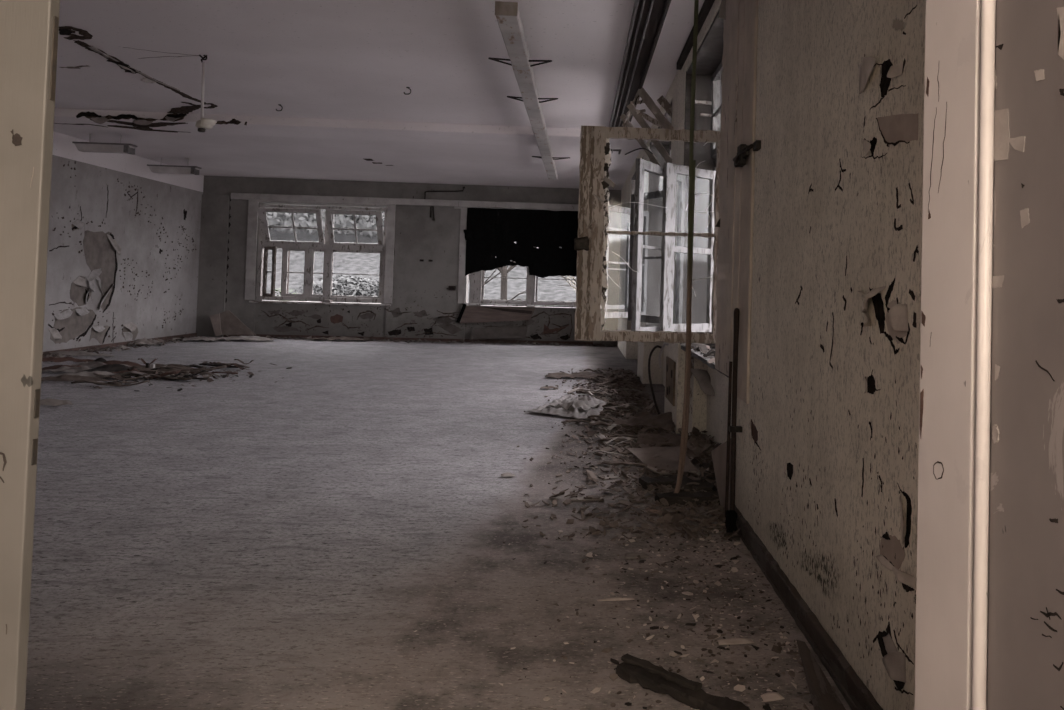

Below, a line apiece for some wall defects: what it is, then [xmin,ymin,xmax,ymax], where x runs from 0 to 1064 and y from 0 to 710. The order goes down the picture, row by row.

peeling [1056,7,1064,60]
peeling [76,102,218,133]
peeling [859,55,918,159]
crack [808,159,846,194]
peeling [48,179,196,344]
peeling [257,290,575,340]
peeling [857,278,926,355]
peeling [864,370,881,394]
peeling [898,366,924,460]
peeling [779,462,822,567]
peeling [830,483,917,695]